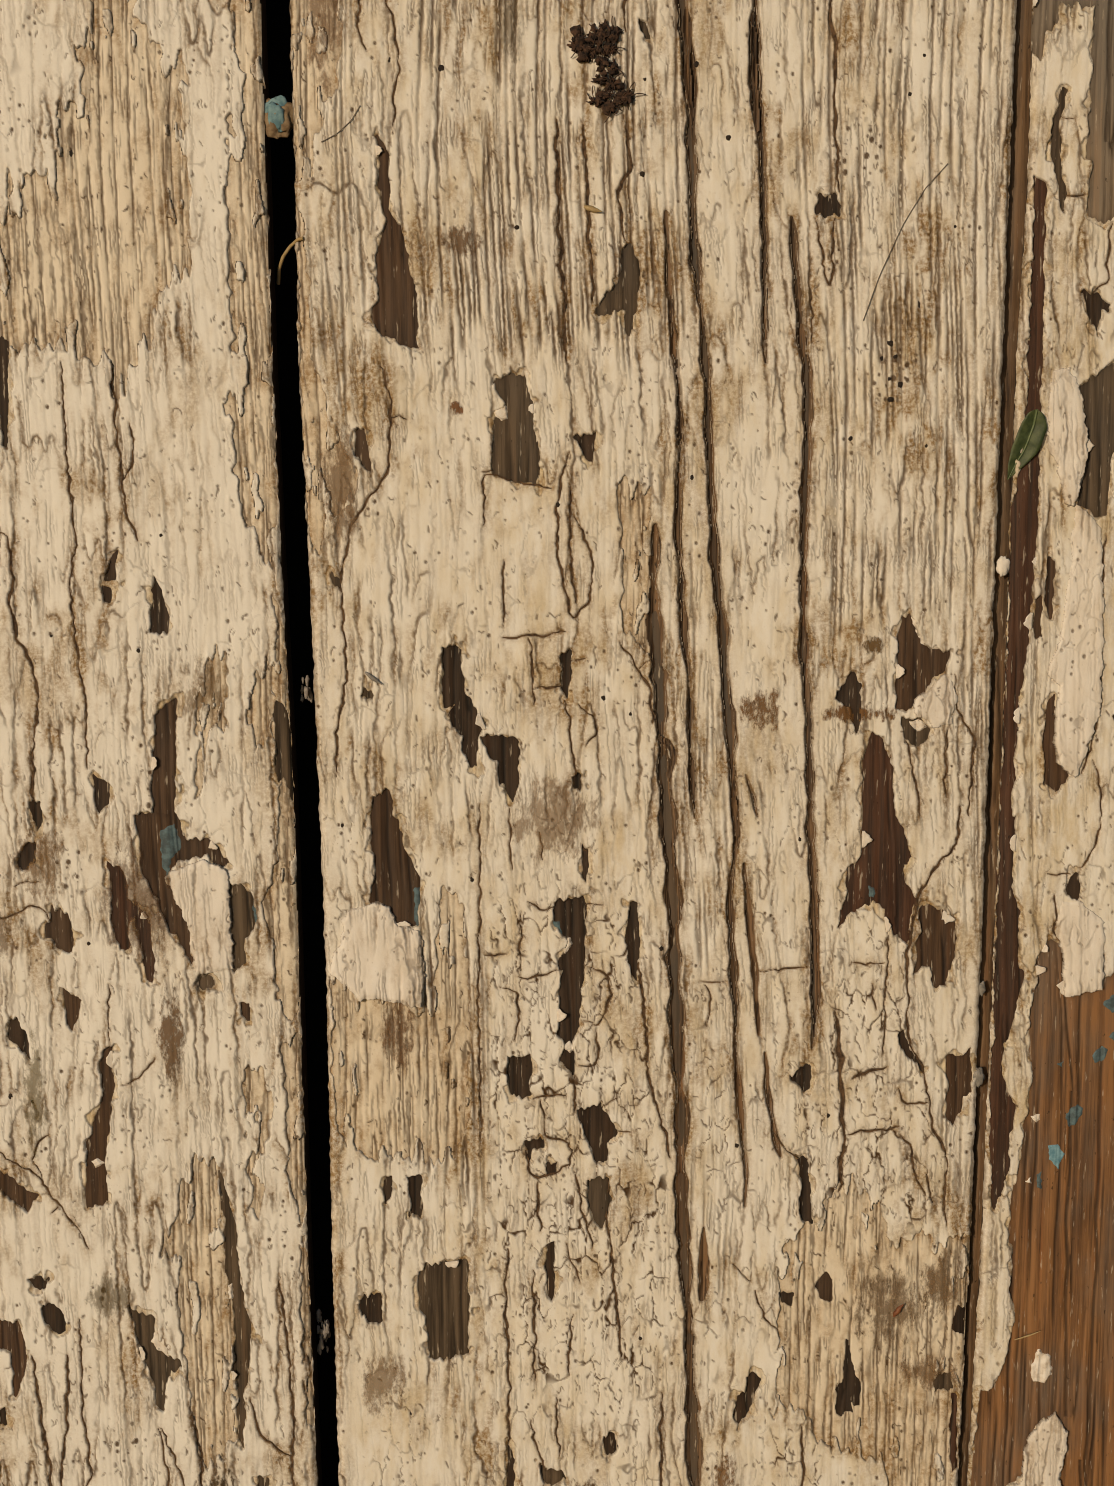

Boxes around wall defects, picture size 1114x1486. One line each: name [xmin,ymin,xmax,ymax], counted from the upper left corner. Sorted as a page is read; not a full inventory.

peeling [371,134,419,349]
crack [60,362,89,768]
crack [334,364,405,777]
peeling [442,645,520,802]
crack [482,452,598,776]
peeling [733,87,1114,1486]
peeling [107,597,315,1468]
peeling [330,788,472,1218]
crack [477,804,670,1357]
crack [31,1319,93,1486]
peeling [418,1259,470,1360]
crack [504,1248,573,1471]